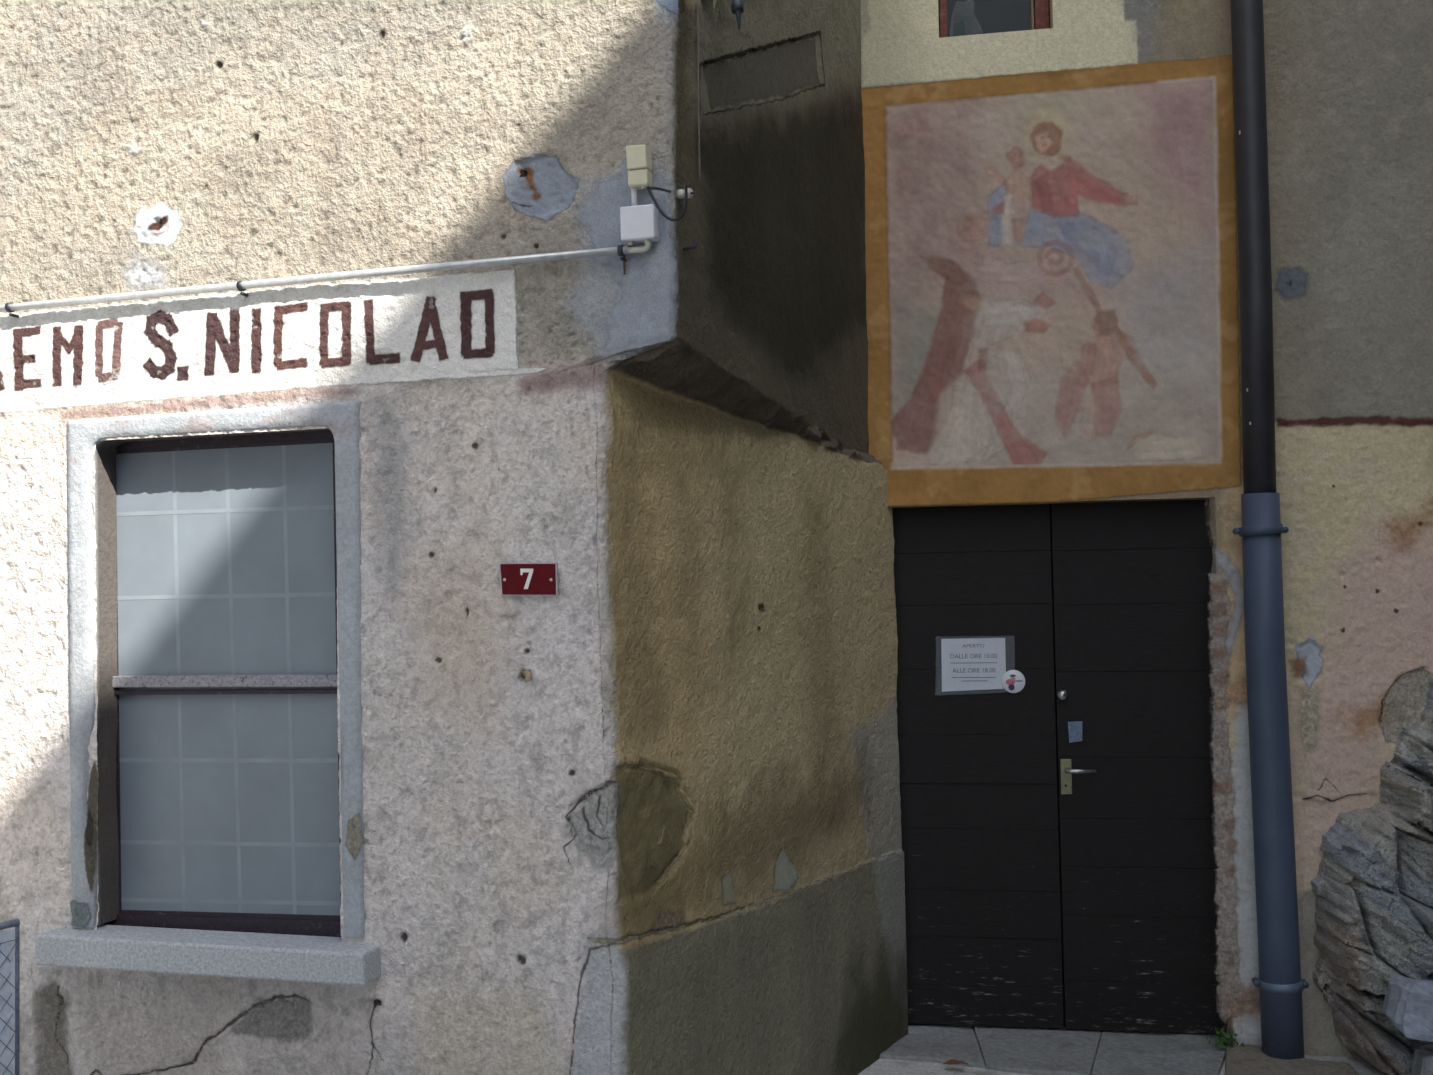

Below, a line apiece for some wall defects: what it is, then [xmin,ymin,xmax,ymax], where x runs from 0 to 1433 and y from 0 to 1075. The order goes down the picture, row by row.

peeling [133,202,183,247]
spalling [502,153,580,221]
peeling [1292,637,1323,688]
spalling [70,761,99,927]
spalling [345,813,363,859]
flaking render [568,782,619,868]
flaking render [1208,552,1260,1020]
crack [55,986,312,1075]